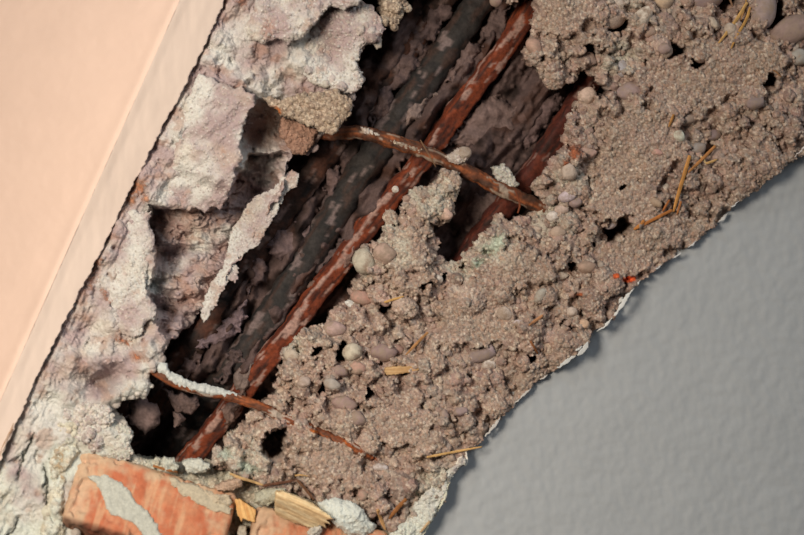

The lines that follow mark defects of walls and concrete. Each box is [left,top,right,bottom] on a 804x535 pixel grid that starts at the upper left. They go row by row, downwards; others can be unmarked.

crack [0,425,35,478]
crack [41,466,49,505]
flaking render [0,0,463,535]
spalling [211,0,804,535]